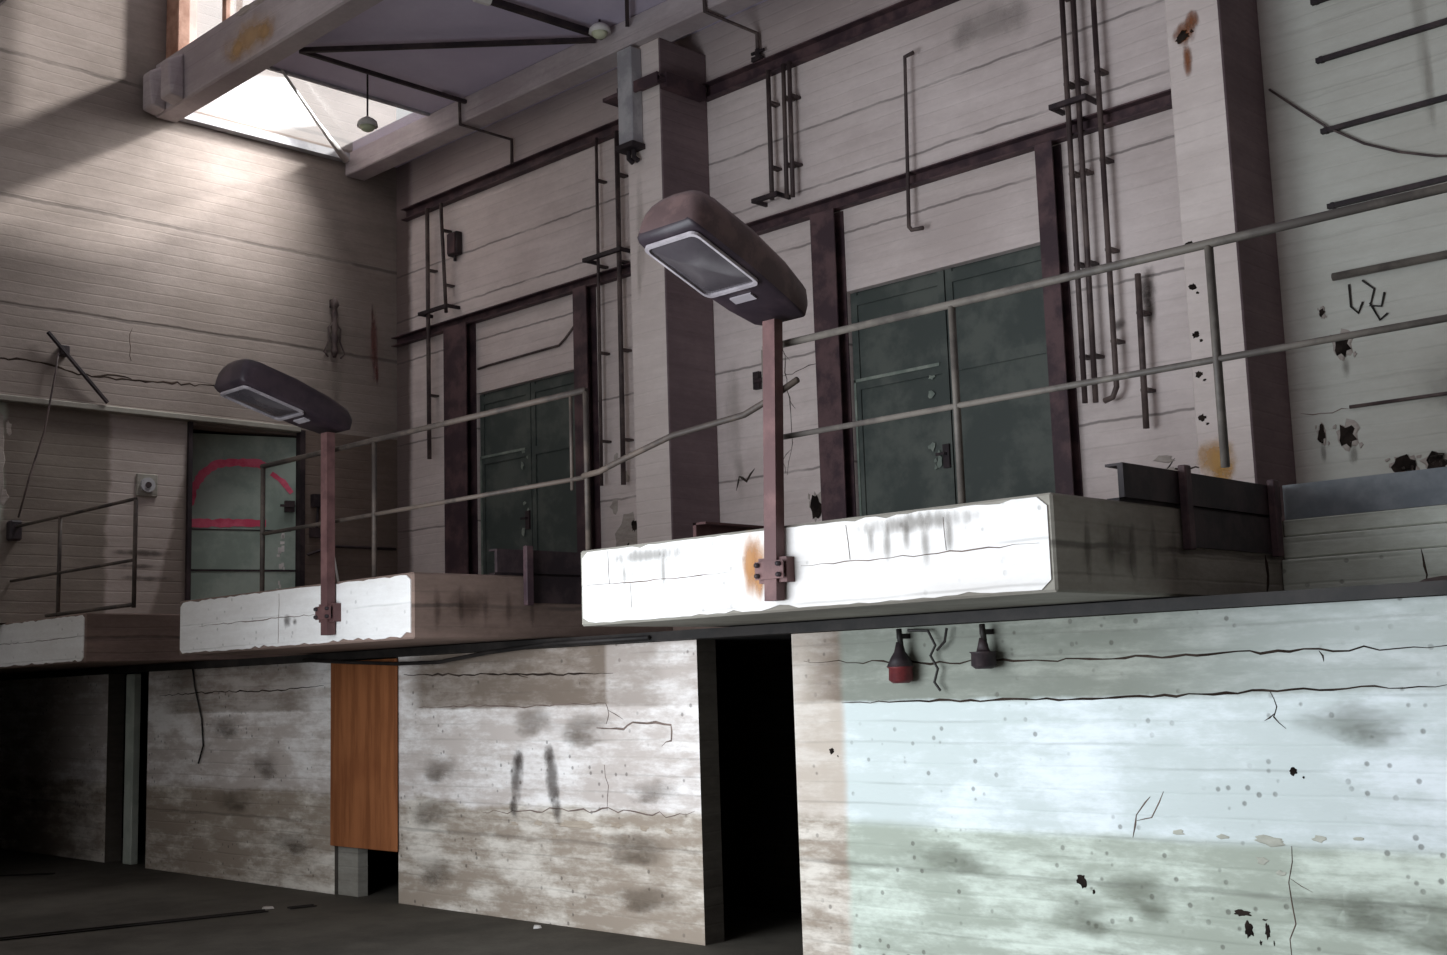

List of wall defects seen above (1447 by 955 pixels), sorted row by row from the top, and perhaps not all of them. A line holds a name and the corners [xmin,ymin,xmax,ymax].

rust [1176,12,1197,72]
crack [0,328,215,386]
crack [736,351,814,491]
rust [1202,446,1232,479]
peeling [610,499,637,547]
rust [745,546,763,592]
crack [805,645,1447,728]
crack [1288,846,1312,955]